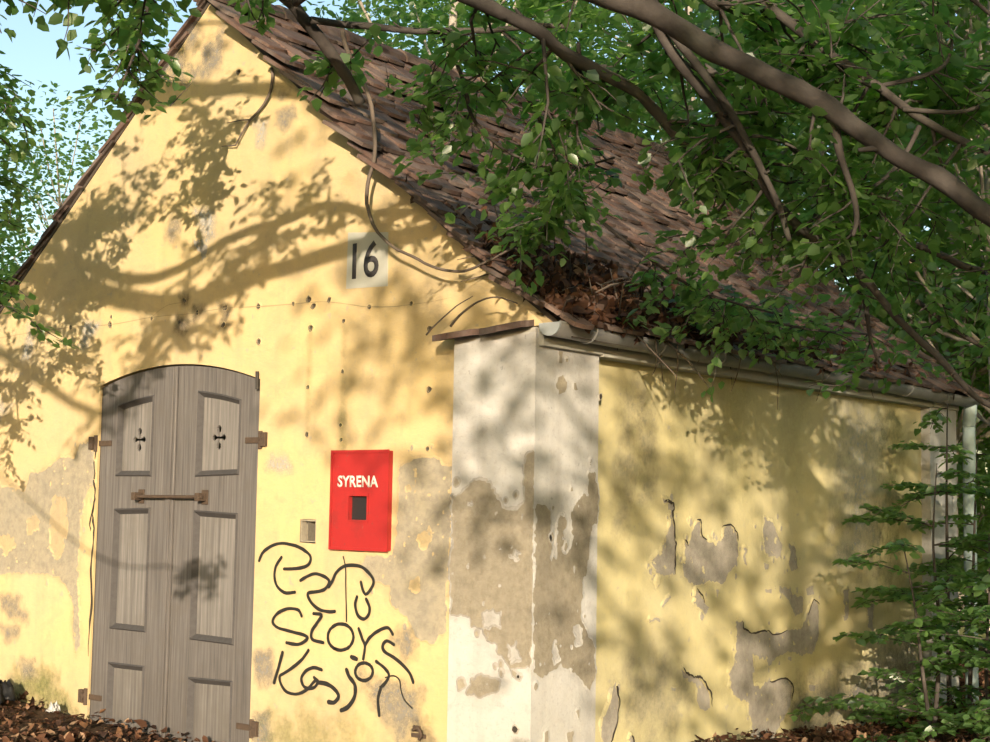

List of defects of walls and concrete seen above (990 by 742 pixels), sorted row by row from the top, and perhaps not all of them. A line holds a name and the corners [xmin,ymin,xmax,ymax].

peeling [0,440,97,653]
peeling [360,443,600,699]
peeling [598,681,635,742]
peeling [670,662,714,713]
peeling [645,492,748,625]
peeling [726,512,820,739]